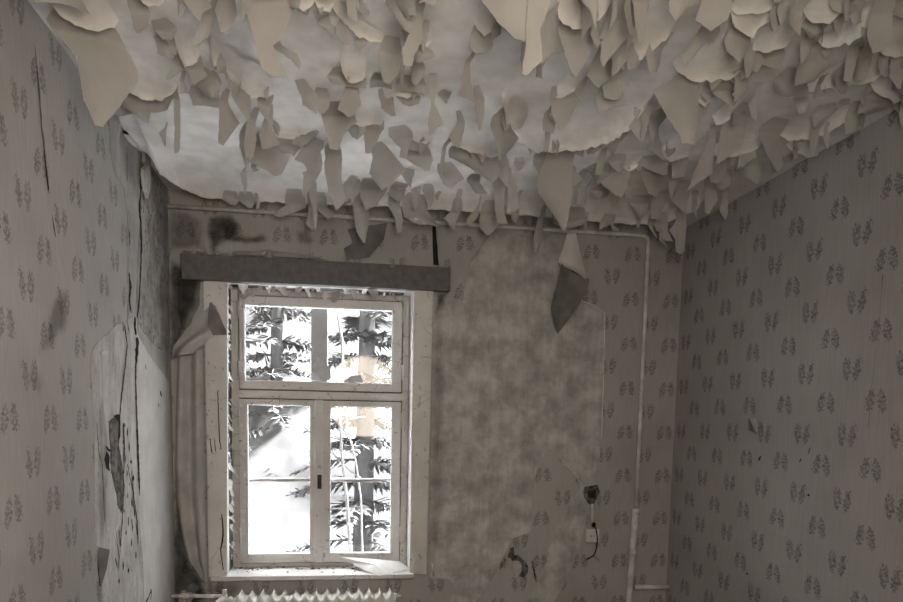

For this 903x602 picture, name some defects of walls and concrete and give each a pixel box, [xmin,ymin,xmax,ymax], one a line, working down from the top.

spalling [105,414,137,558]
crack [96,176,162,569]
peeling [33,0,903,378]
spalling [500,547,537,582]